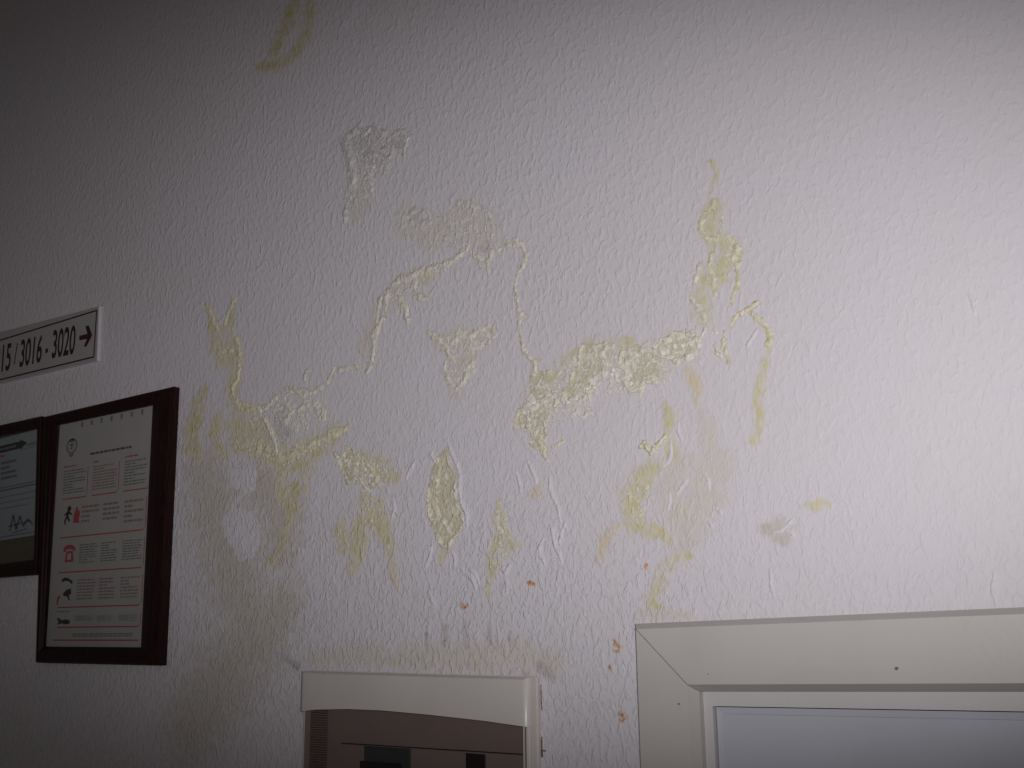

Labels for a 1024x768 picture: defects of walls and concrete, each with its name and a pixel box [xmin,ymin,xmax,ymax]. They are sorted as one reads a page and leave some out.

peeling [203,297,267,416]
flaking render [470,156,775,463]
flaking render [332,444,405,494]
flaking render [425,443,470,571]
leakage [593,342,775,624]